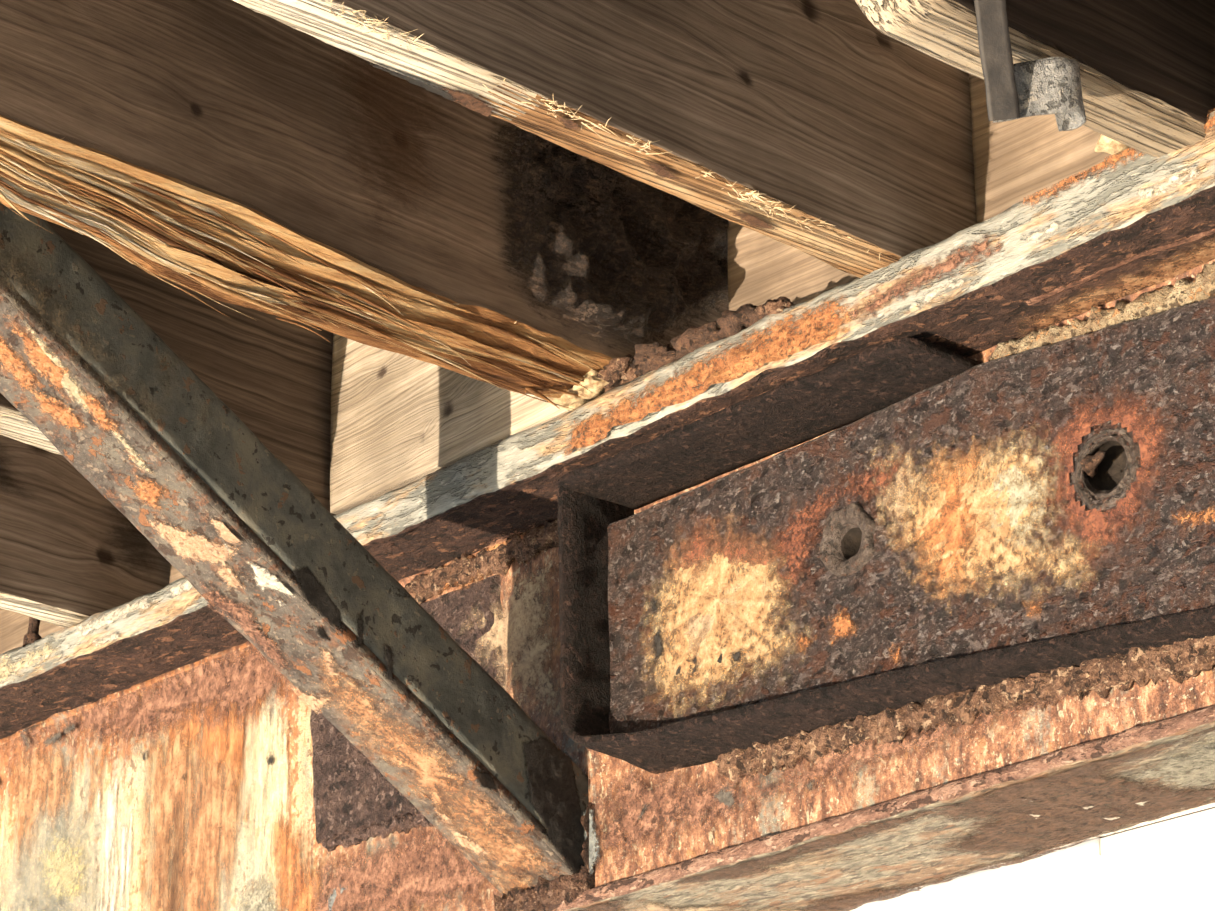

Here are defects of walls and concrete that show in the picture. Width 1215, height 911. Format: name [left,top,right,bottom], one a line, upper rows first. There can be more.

rust [849,235,1002,322]
rust [771,398,1163,598]
rust [1177,508,1215,528]
peeling [646,528,792,700]
rust [830,609,855,644]
rust [1,580,290,911]
rust [273,671,545,911]
rust [580,896,744,911]
rust [592,691,1088,862]
rust [659,727,1215,911]